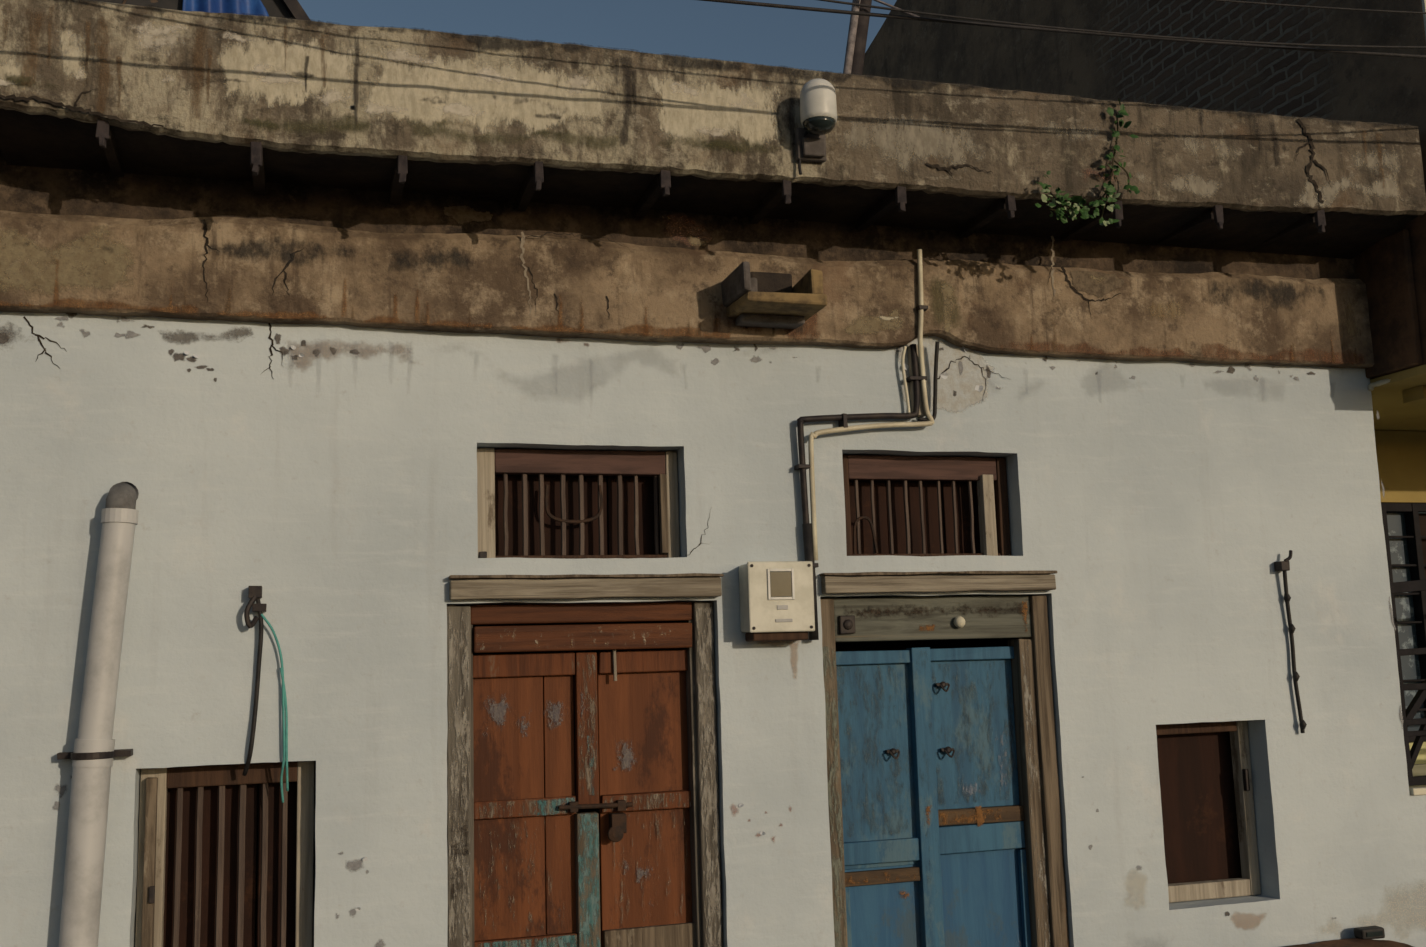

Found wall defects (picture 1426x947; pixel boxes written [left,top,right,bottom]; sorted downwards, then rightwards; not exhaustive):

leakage [452,33,543,50]
crack [1295,118,1331,203]
crack [23,316,67,366]
crack [201,219,220,302]
crack [261,248,304,378]
peeling [275,333,360,360]
flaking render [896,337,1001,417]
crack [1048,236,1121,320]